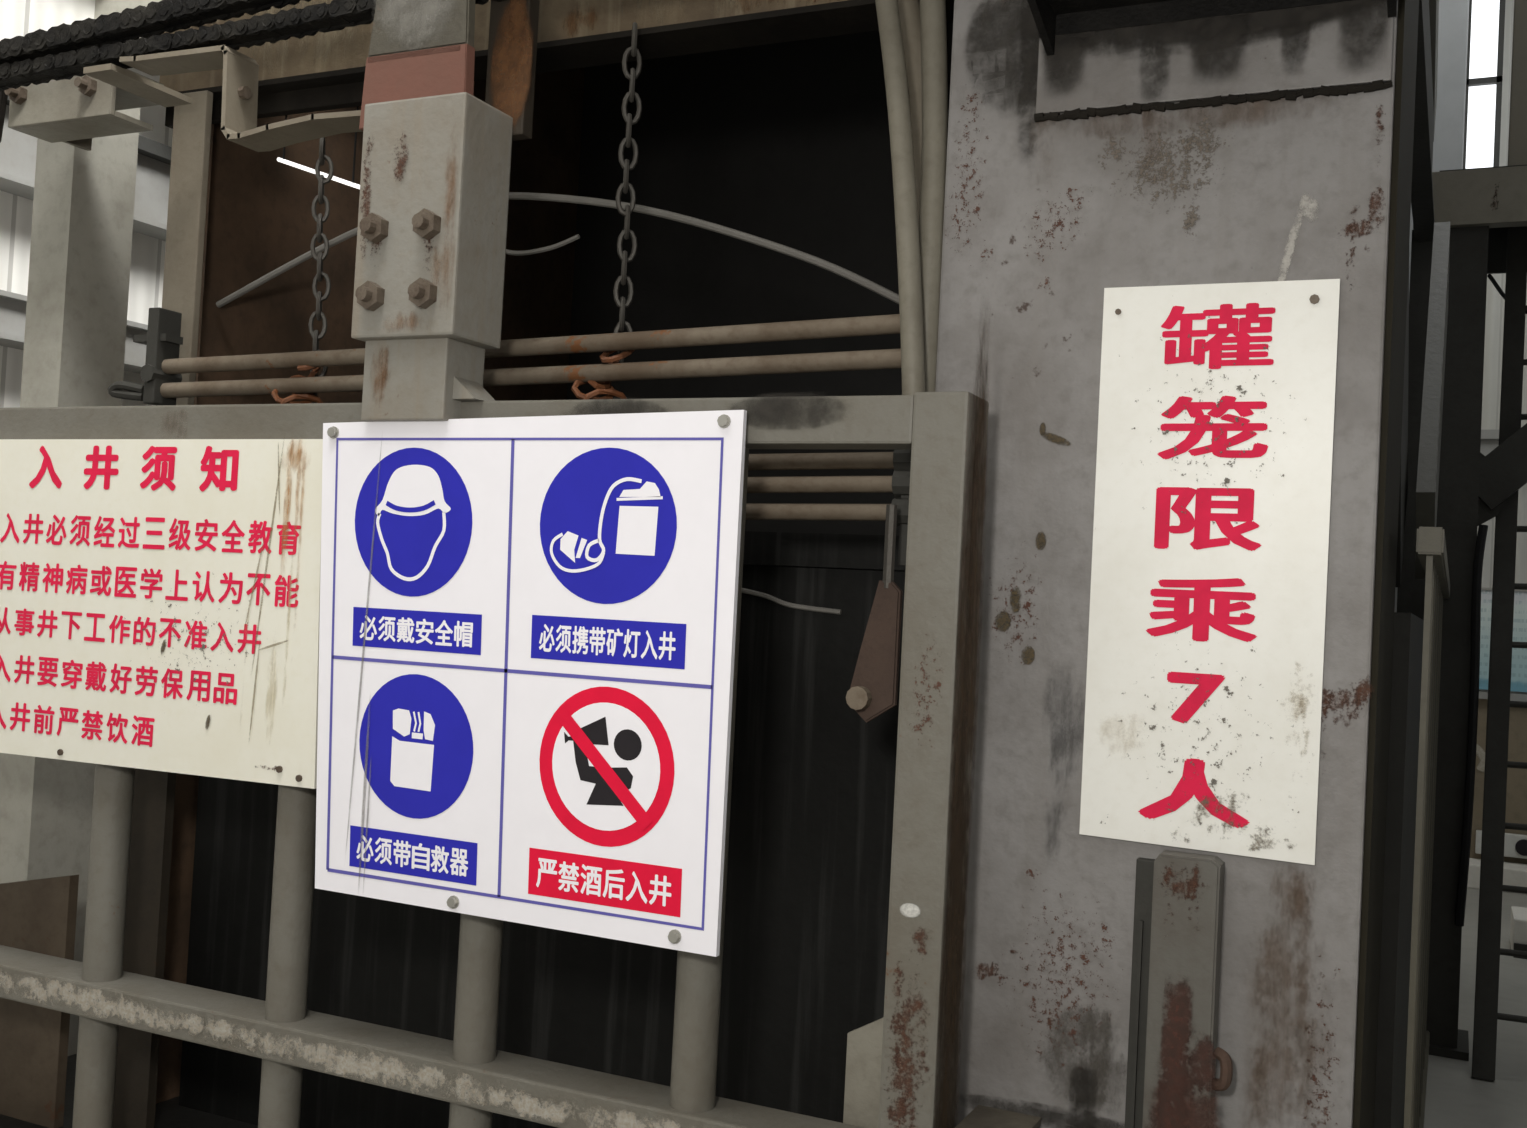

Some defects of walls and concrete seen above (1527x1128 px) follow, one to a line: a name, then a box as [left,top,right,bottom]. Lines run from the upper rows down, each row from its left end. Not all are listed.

water stain [1020,0,1086,102]
water stain [1193,13,1245,75]
water stain [1340,0,1387,62]
corrosion [884,329,1123,1128]
corrosion [1150,981,1218,1128]